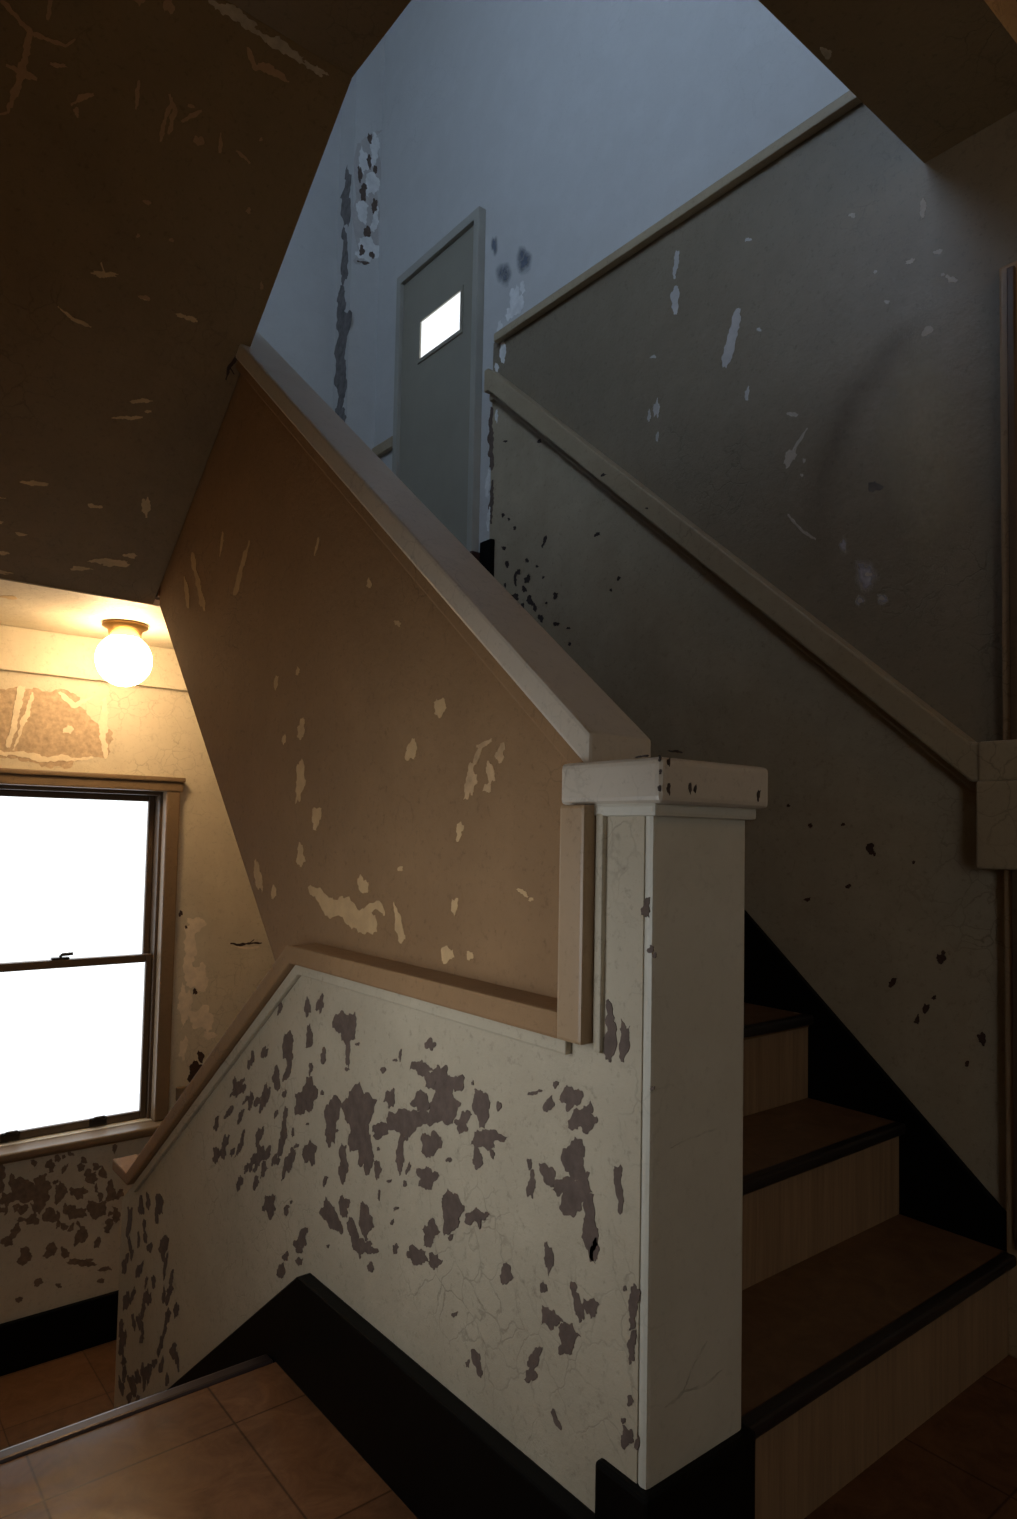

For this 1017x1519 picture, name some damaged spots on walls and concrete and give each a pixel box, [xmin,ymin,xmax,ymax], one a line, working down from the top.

peeling [485,407,516,532]
flaking render [0,686,113,769]
peeling [308,874,406,944]
peeling [177,910,217,1083]
peeling [603,999,630,1063]
peeling [212,993,507,1279]
peeling [526,1081,600,1264]
peeling [613,1164,624,1215]
peeling [0,1144,179,1408]
peeling [524,1242,599,1383]
peeling [623,1283,641,1365]
peeling [621,1395,640,1450]